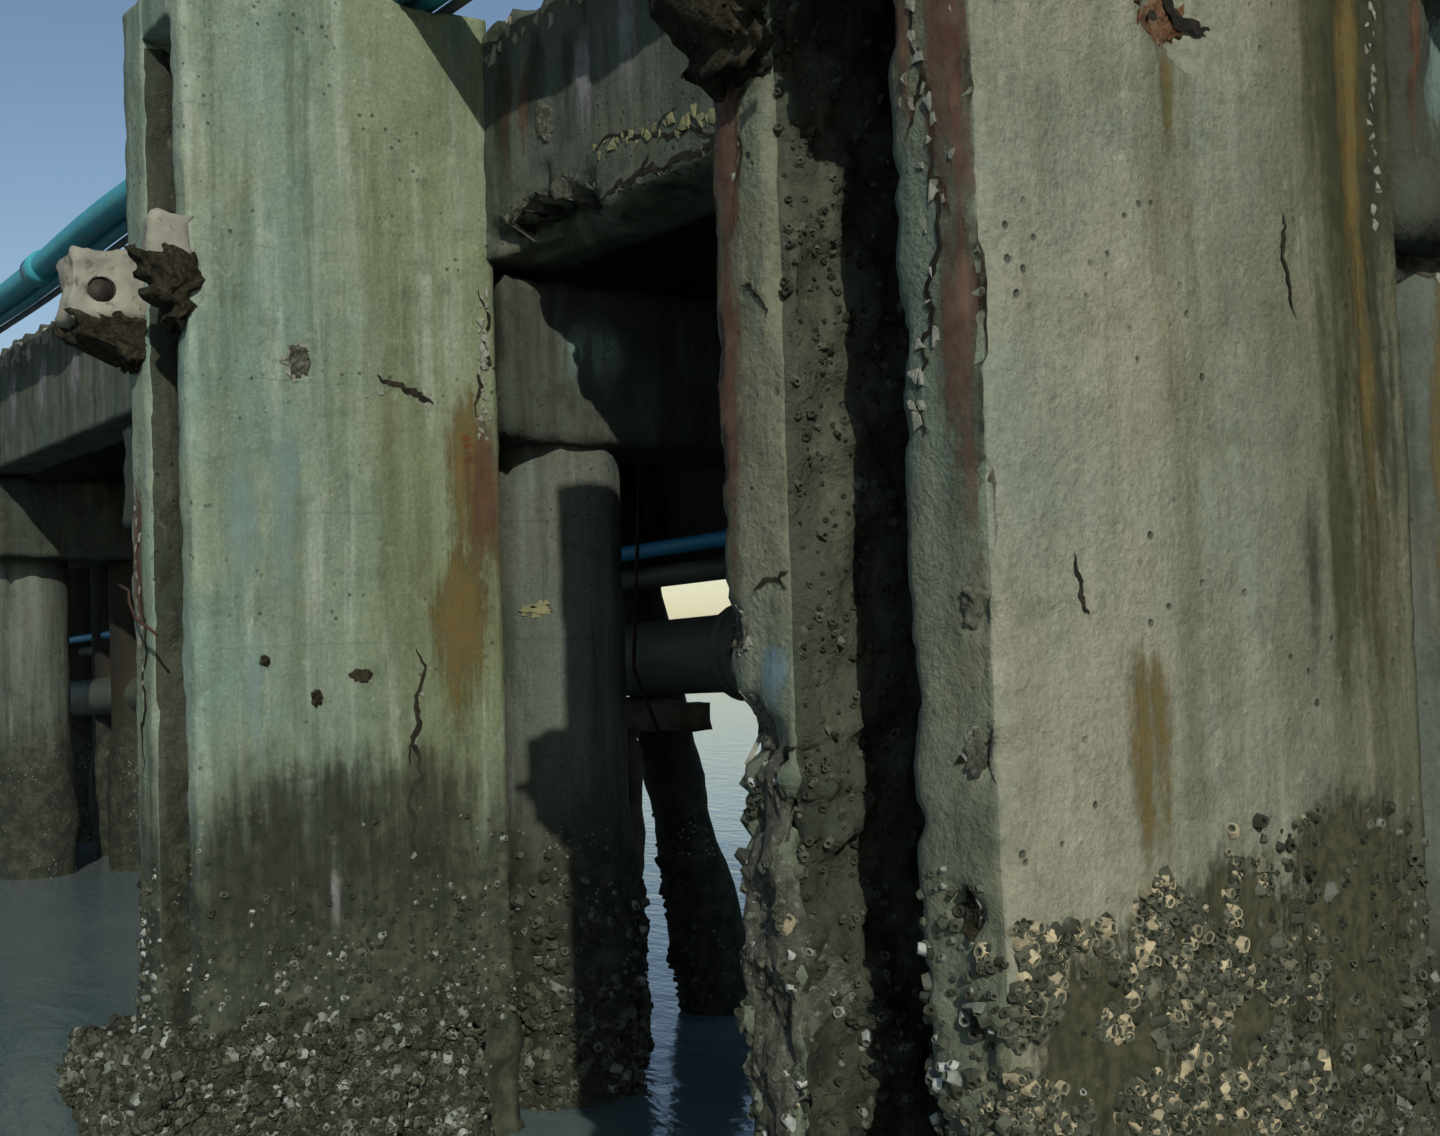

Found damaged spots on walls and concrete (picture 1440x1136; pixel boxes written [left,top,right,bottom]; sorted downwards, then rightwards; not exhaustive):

spalling [280,340,312,383]
crack [593,80,746,237]
rust [714,86,741,566]
crack [898,0,955,436]
rust [895,0,991,512]
rust [431,391,499,714]
spalling [310,688,323,708]
water stain [212,752,472,953]
spalling [348,667,373,684]
crack [406,649,427,871]
spalling [739,691,858,1136]
rust [1133,657,1171,847]